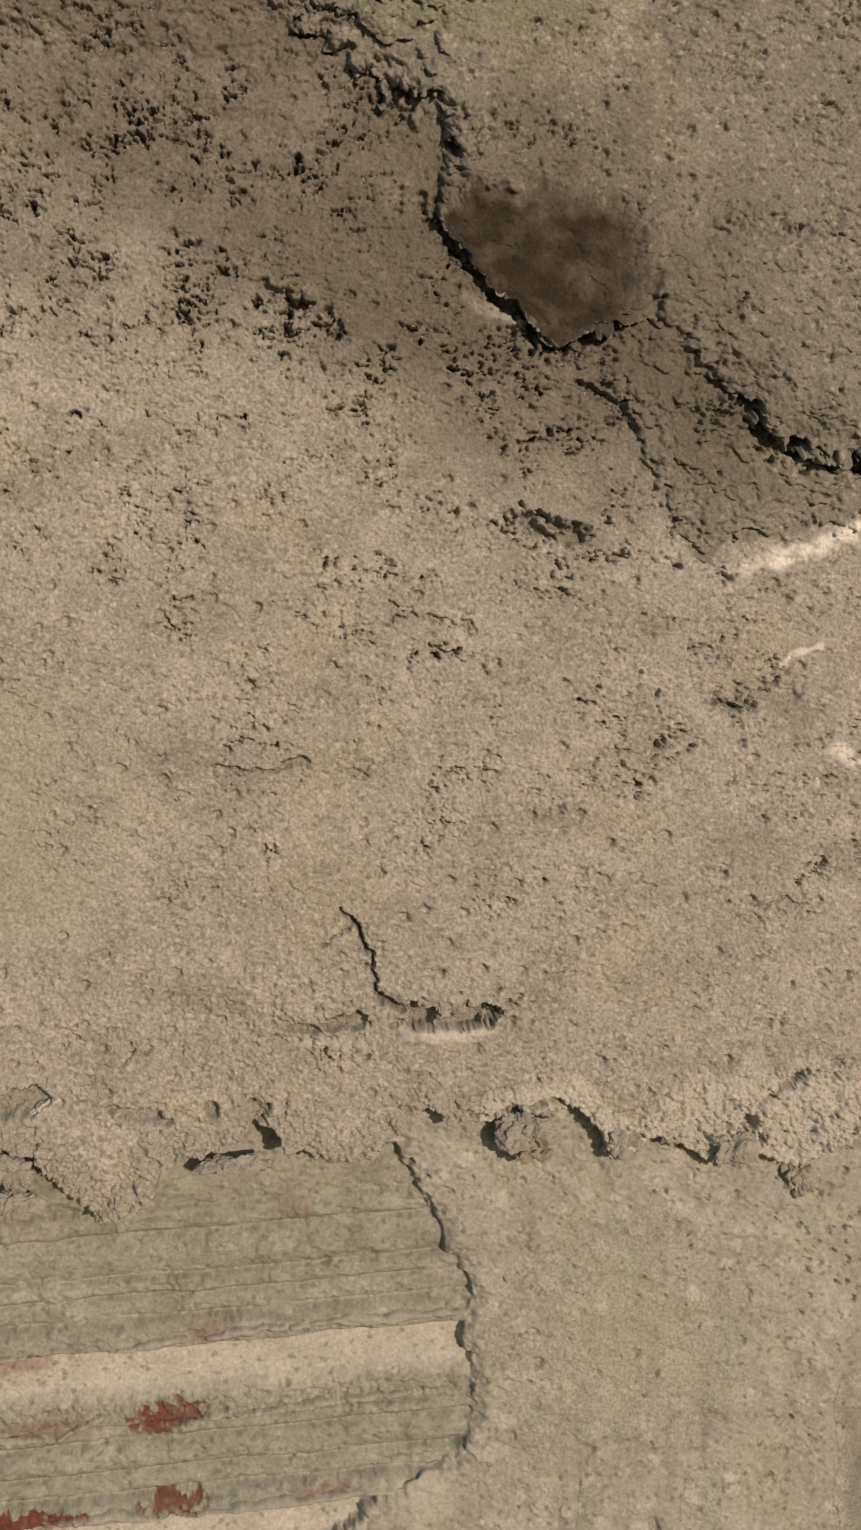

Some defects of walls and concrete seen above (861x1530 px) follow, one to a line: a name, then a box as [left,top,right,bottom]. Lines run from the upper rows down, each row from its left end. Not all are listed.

crack [320,907,409,1014]
flaking render [0,1386,232,1450]
flaking render [0,1496,93,1530]
flaking render [132,1481,225,1520]